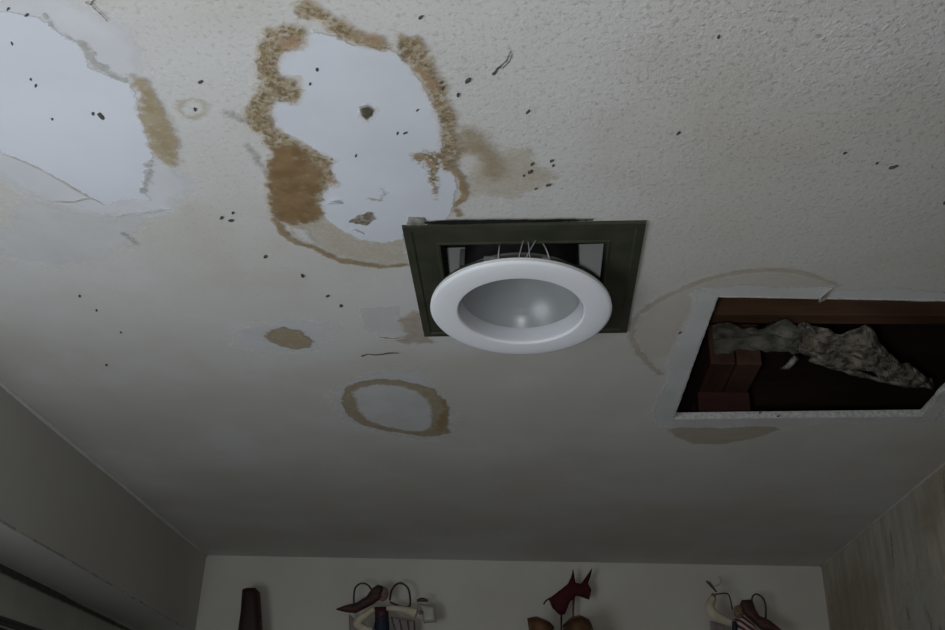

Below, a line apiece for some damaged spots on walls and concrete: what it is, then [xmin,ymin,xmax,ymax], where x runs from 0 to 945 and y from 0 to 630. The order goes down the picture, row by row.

peeling [0,0,192,266]
water stain [132,79,178,166]
peeling [271,31,457,243]
water stain [457,129,553,196]
water stain [235,321,332,350]
water stain [334,369,455,440]